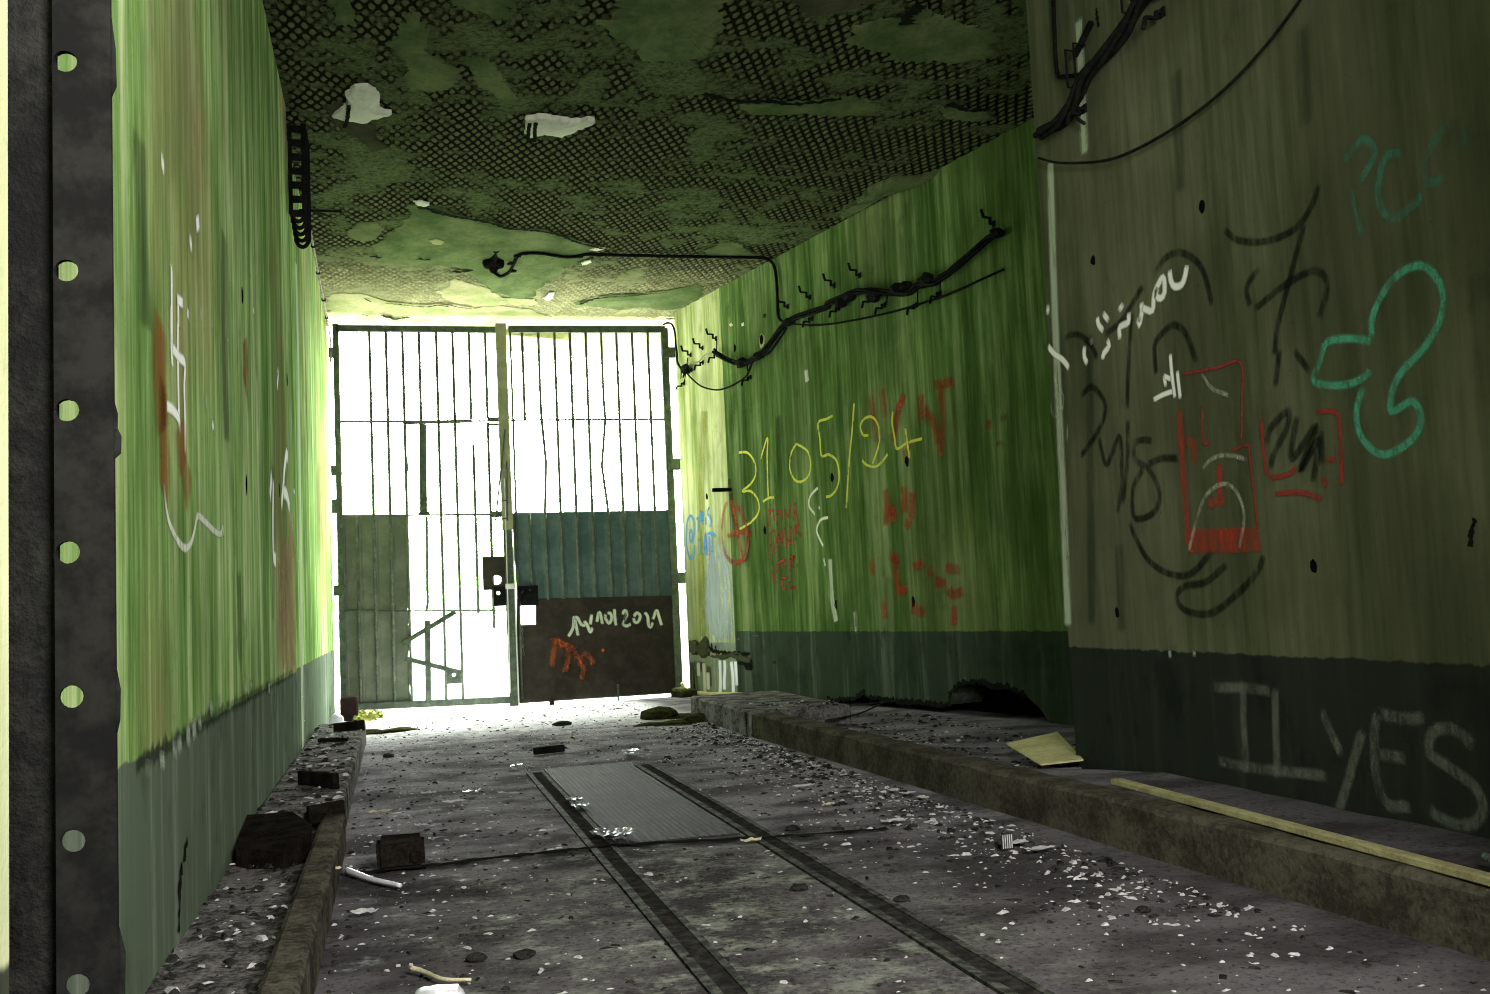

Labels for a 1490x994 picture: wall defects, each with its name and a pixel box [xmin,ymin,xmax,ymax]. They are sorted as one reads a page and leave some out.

peeling [328,0,357,27]
peeling [596,0,731,64]
peeling [843,2,1002,64]
peeling [386,10,595,142]
peeling [332,83,392,128]
peeling [739,94,881,118]
peeling [939,105,999,122]
peeling [325,200,606,334]
peeling [574,284,704,310]